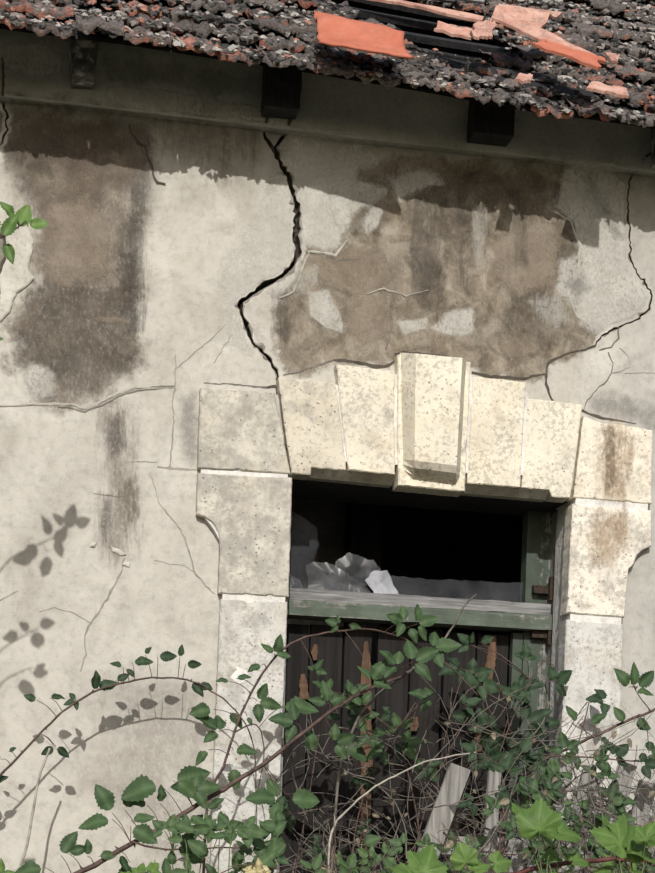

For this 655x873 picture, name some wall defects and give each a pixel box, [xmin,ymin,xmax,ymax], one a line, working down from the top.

crack [0,57,9,145]
water stain [8,110,150,408]
crack [0,117,448,594]
flaking render [275,155,597,382]
crack [472,152,655,424]
crack [40,558,125,672]